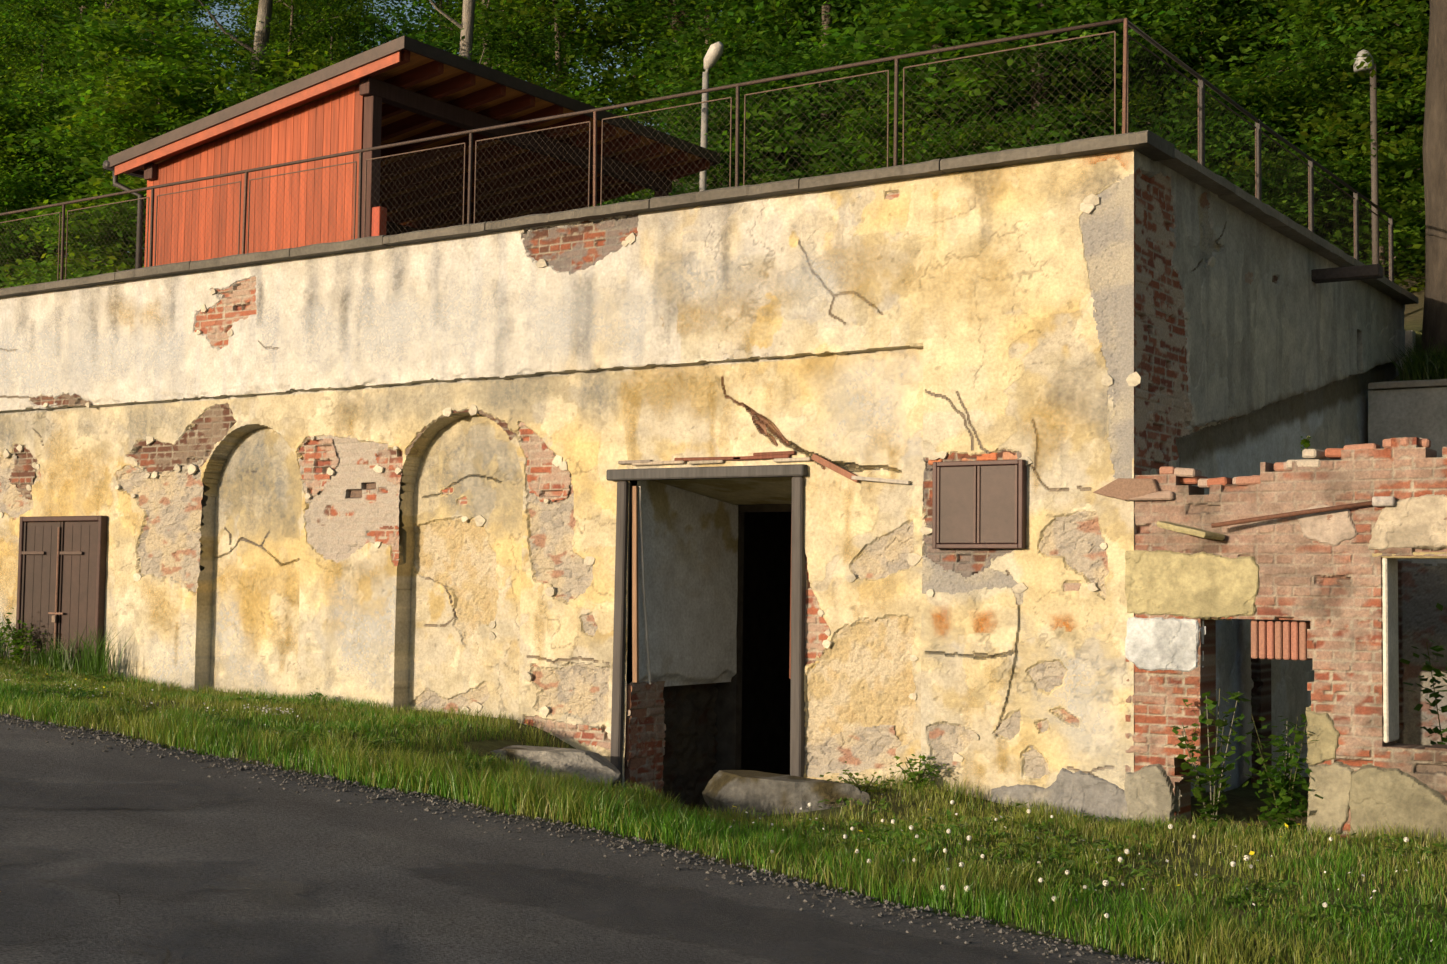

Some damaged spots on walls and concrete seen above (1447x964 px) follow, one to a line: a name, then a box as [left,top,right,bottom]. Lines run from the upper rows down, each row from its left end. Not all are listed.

flaking render [194,276,257,349]
flaking render [519,214,639,274]
crack [798,240,883,325]
flaking render [1079,168,1193,479]
flaking render [0,444,41,520]
flaking render [115,403,237,593]
flaking render [298,404,595,644]
crack [721,376,826,470]
crack [925,389,992,454]
crack [1030,419,1091,492]
flaking render [804,555,1021,778]
flaking render [523,715,611,750]